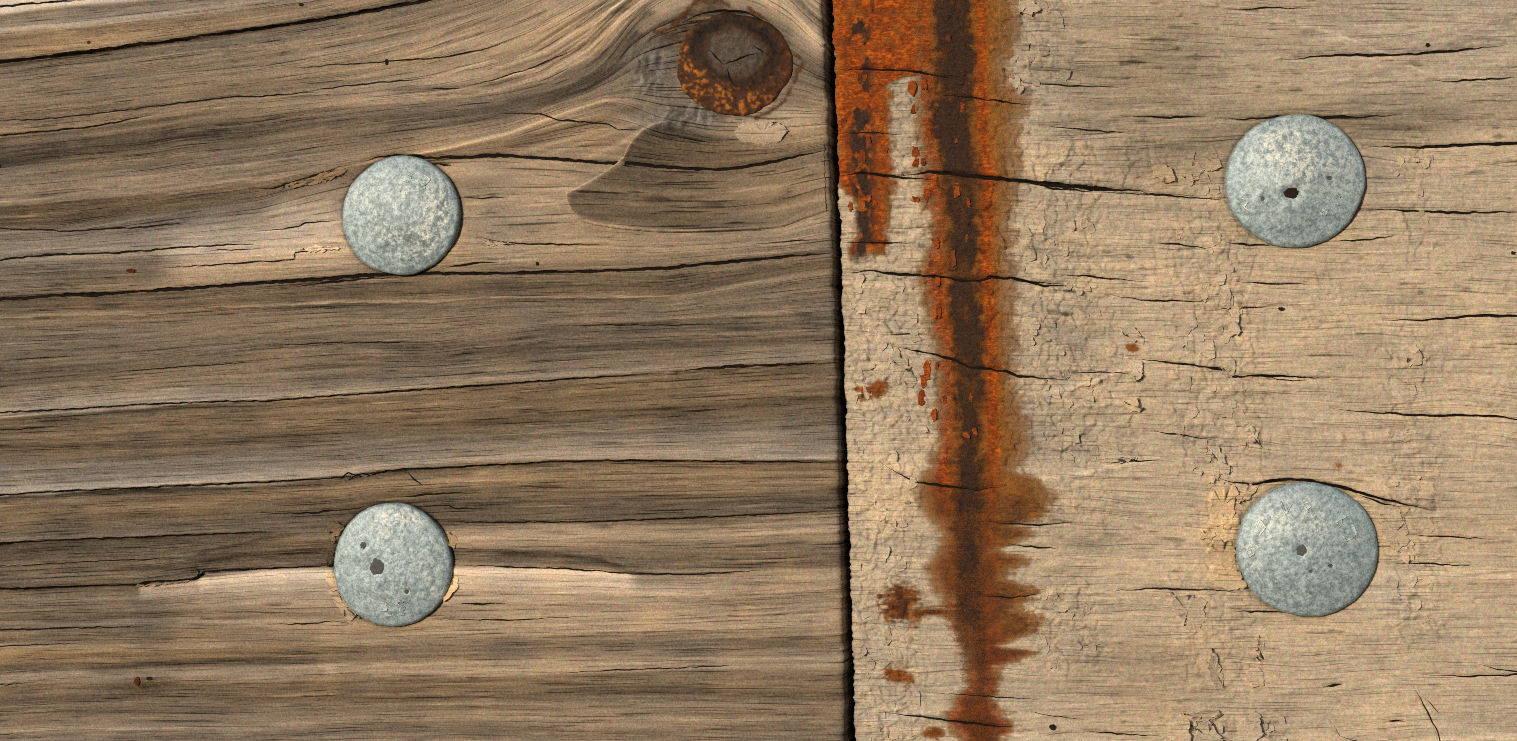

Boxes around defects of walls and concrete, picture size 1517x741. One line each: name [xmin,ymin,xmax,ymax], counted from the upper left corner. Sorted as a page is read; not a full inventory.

crack [1284,44,1517,82]
crack [0,36,1220,200]
crack [849,68,1517,149]
crack [0,220,1309,310]
rust [832,0,1055,741]
peeling [1175,230,1262,591]
crack [1220,478,1484,567]
crack [268,619,344,627]
crack [437,564,756,621]
crack [0,625,150,735]
crack [568,665,725,673]
peeling [1167,651,1287,741]